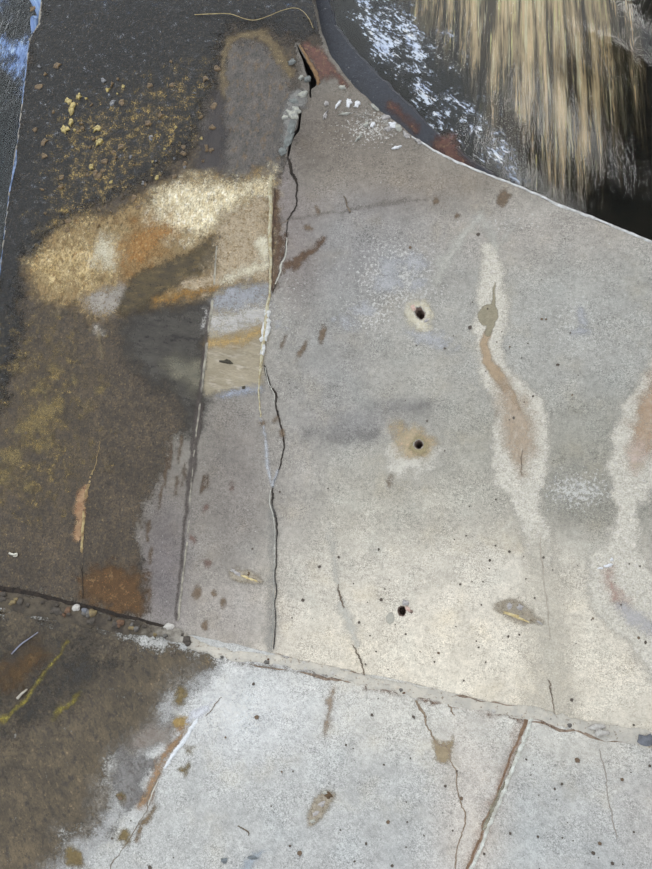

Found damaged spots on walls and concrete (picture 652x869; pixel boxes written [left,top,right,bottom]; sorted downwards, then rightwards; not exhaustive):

peeling [278,75,311,156]
crack [272,45,321,293]
water stain [0,8,323,620]
crack [260,365,285,649]
water stain [0,607,339,869]
crack [415,700,466,869]